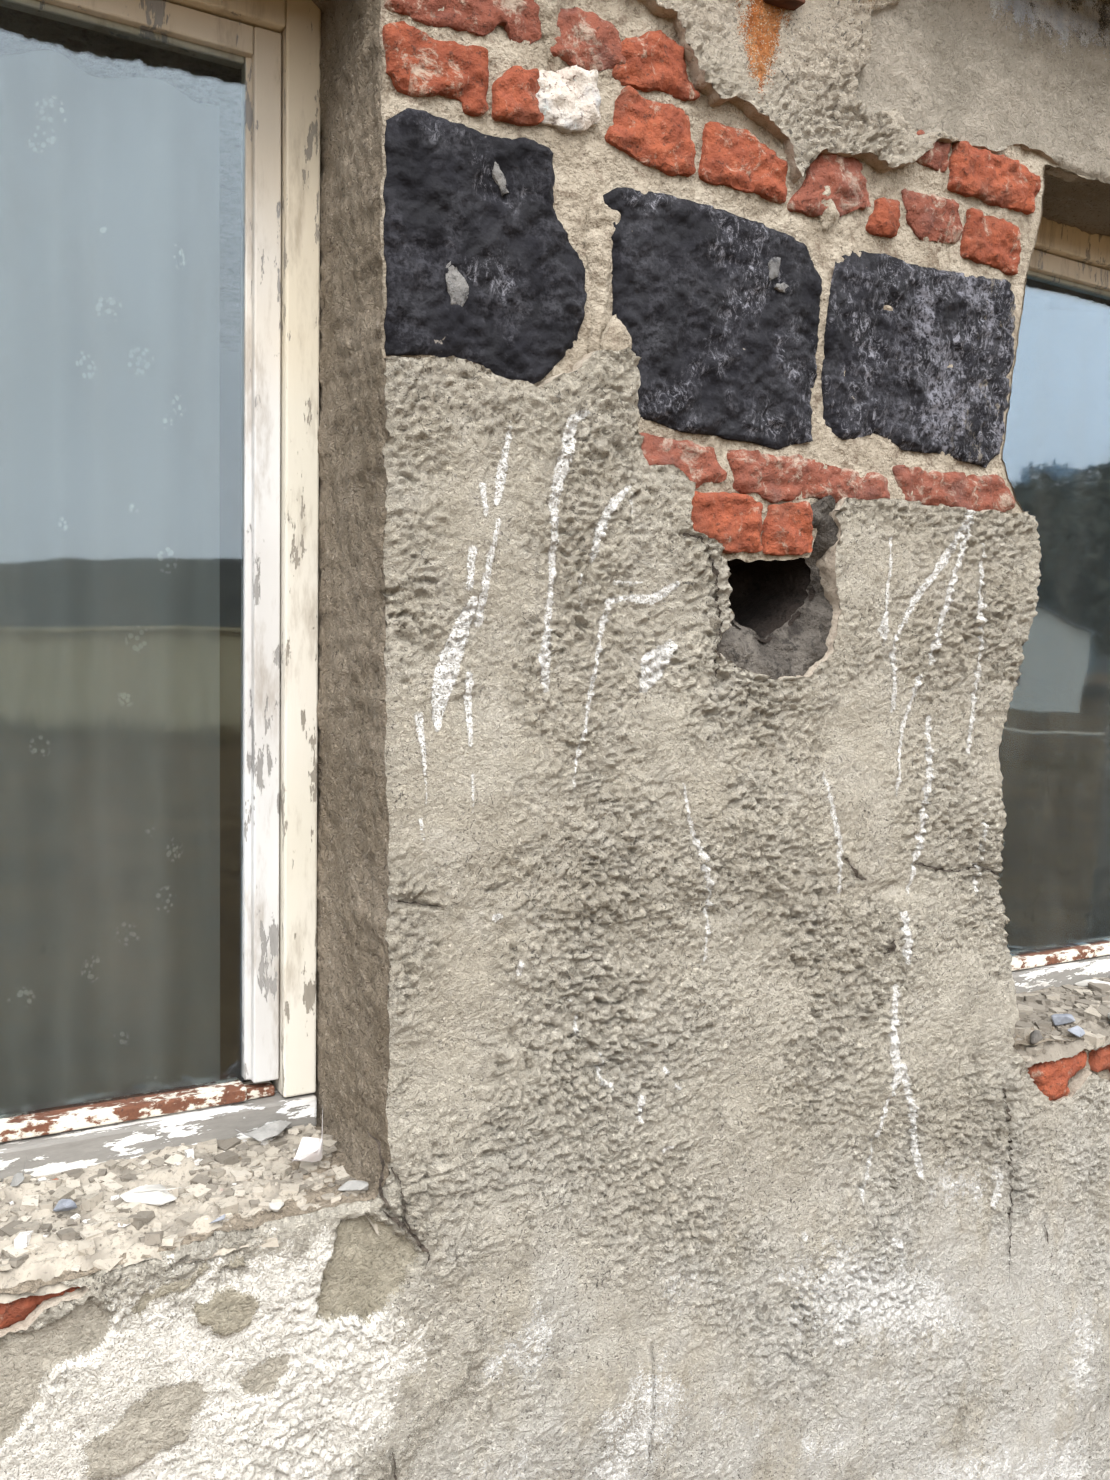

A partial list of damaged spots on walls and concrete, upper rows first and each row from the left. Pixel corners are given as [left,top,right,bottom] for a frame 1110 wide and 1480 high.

rust [735,0,792,101]
flaking render [379,0,1110,680]
crack [391,899,443,908]
flaking render [1013,1043,1110,1101]
crack [367,1131,430,1269]
flaking render [315,1213,420,1324]